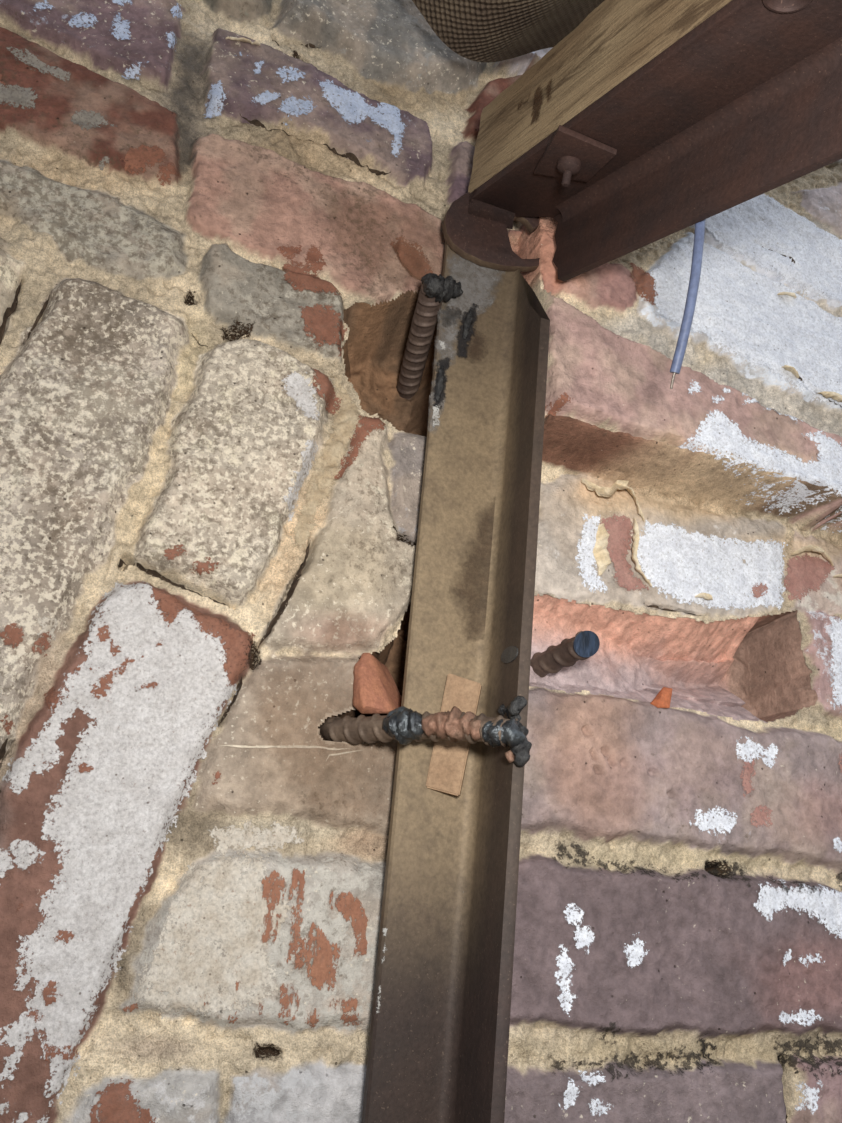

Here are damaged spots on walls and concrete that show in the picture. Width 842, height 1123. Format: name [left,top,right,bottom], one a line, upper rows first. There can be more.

crack [0,279,50,344]
spalling [276,235,446,479]
peeling [629,195,842,407]
peeling [679,379,842,534]
peeling [164,544,219,576]
spalling [358,603,411,697]
spalling [529,478,842,723]
crack [0,738,8,760]
spalling [318,709,388,728]
peeling [689,736,781,836]